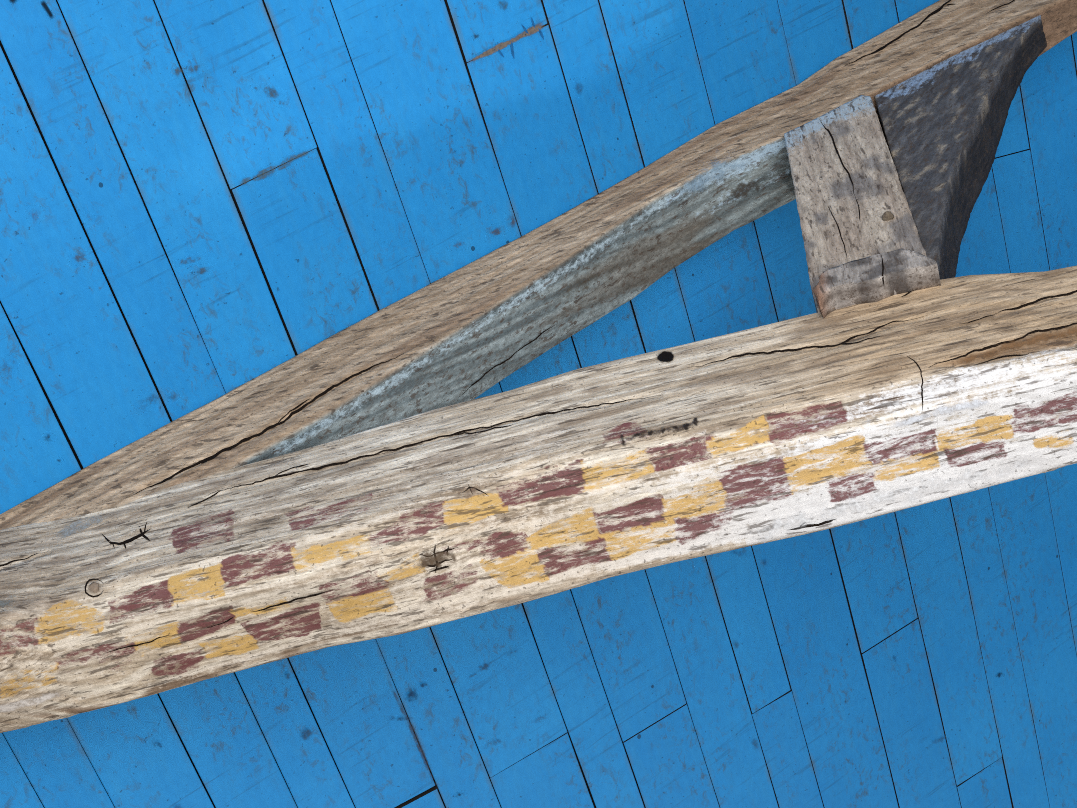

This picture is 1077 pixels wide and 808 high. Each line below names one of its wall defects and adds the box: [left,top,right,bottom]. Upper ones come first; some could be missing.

peeling [473,19,544,61]
crack [960,290,1077,324]
crack [458,322,560,398]
crack [129,353,404,497]
crack [188,395,661,508]
crack [102,522,150,549]
crack [0,551,47,566]